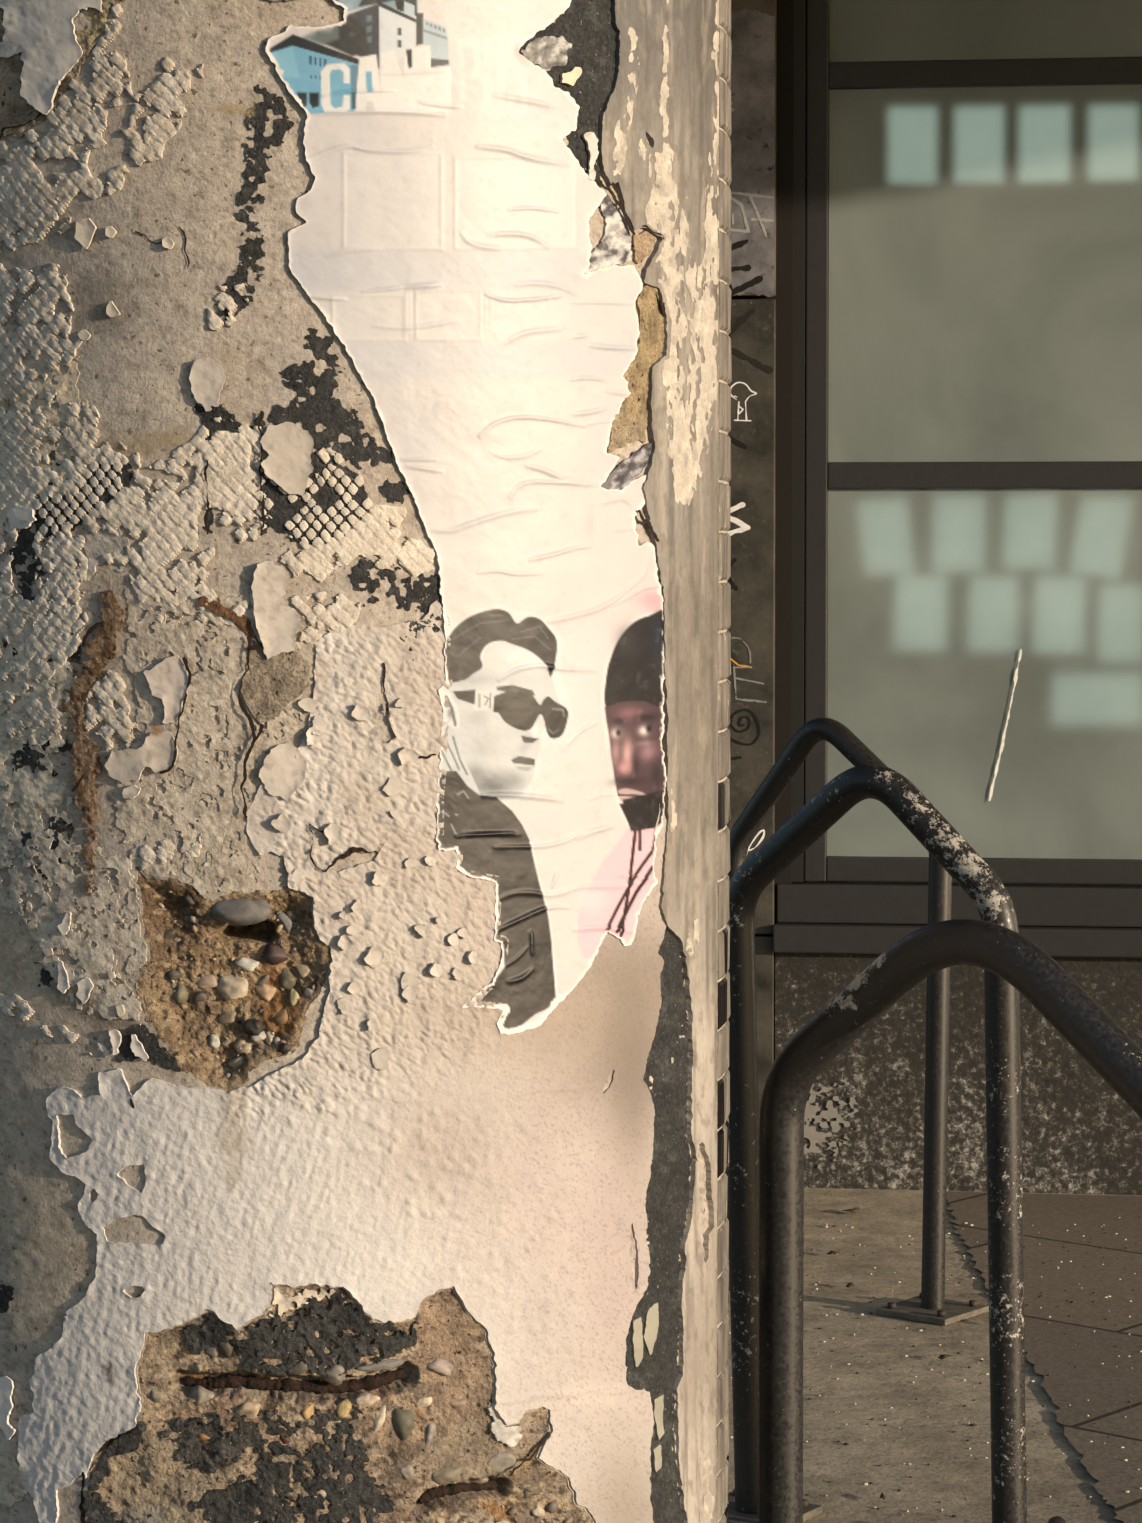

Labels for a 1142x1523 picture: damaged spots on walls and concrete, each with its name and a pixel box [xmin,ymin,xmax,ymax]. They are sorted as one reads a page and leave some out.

corrosion [59,590,127,896]
crack [159,657,192,774]
crack [238,635,264,818]
peeling [0,0,677,1523]